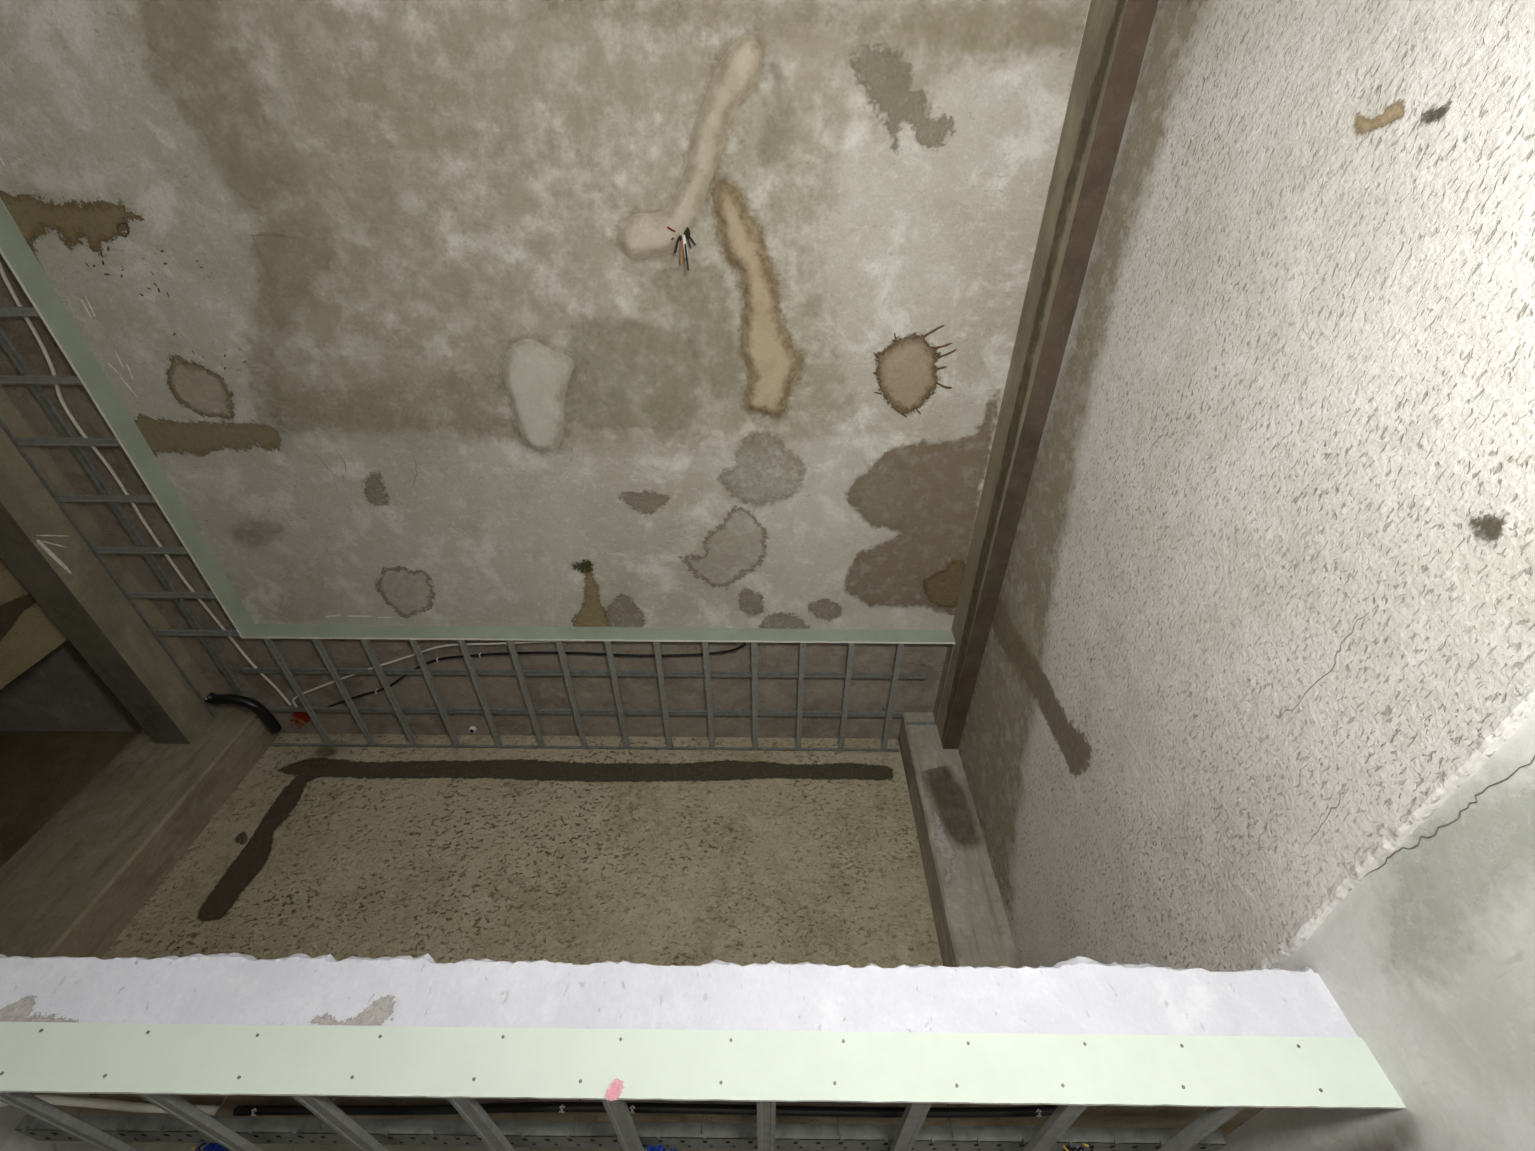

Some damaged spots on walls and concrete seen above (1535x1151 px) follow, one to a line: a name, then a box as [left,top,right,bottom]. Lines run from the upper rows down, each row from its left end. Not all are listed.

water stain [679,0,1203,908]
flaking render [234,831,248,845]
spalling [0,952,674,975]
spalling [701,956,1314,982]
flaking render [0,996,79,1022]
flaking render [311,995,396,1026]